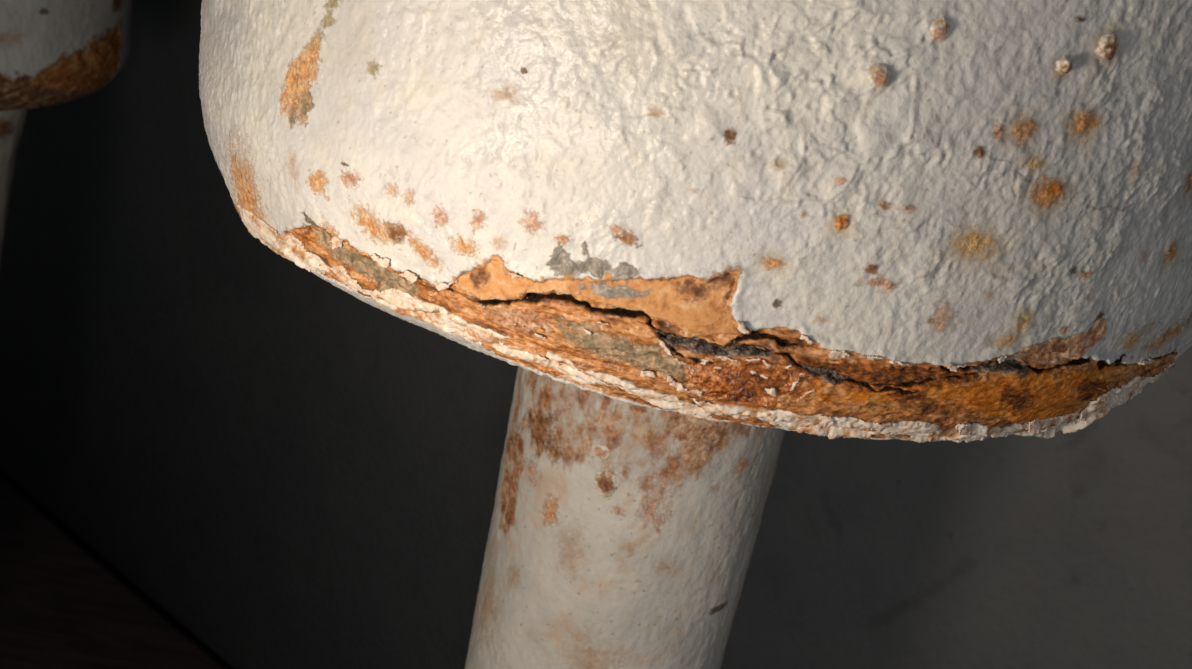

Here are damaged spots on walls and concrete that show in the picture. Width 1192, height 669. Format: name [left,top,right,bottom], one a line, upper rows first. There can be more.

corrosion [0,0,123,139]
corrosion [278,0,337,128]
corrosion [226,134,266,224]
corrosion [308,170,360,200]
corrosion [350,201,441,271]
corrosion [450,210,484,257]
corrosion [519,211,541,231]
corrosion [610,225,642,248]
spalling [237,202,1177,443]
crack [446,288,1126,394]
corrosion [860,265,894,291]
corrosion [499,368,761,533]